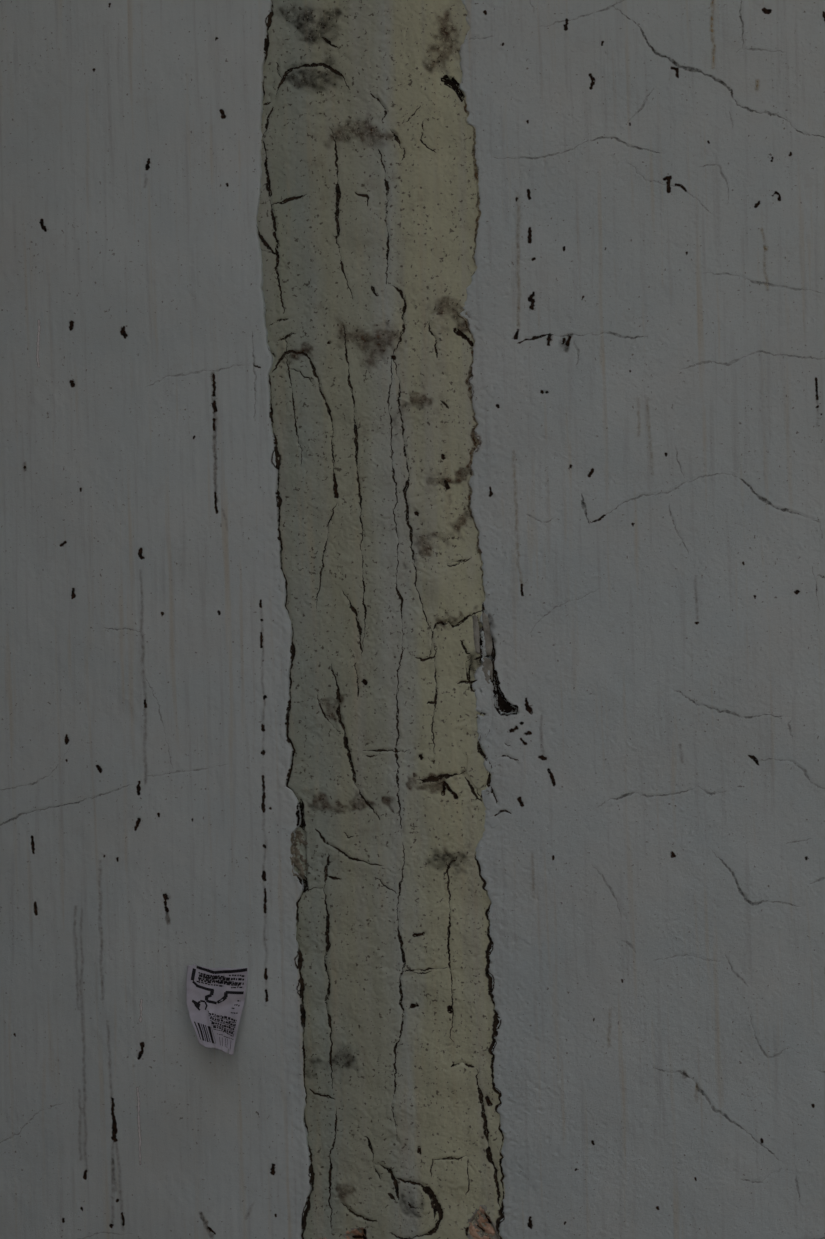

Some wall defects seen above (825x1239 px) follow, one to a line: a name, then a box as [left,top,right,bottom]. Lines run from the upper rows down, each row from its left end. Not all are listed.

spalling [441,75,465,102]
crack [622,13,822,137]
spalling [453,328,473,347]
crack [518,334,553,344]
crack [581,494,606,523]
crack [741,479,799,514]
crack [254,2,519,1239]
spalling [490,669,518,716]
spalling [441,781,458,799]
spalling [290,799,309,893]
spalling [343,1227,368,1239]
spalling [465,1205,500,1239]